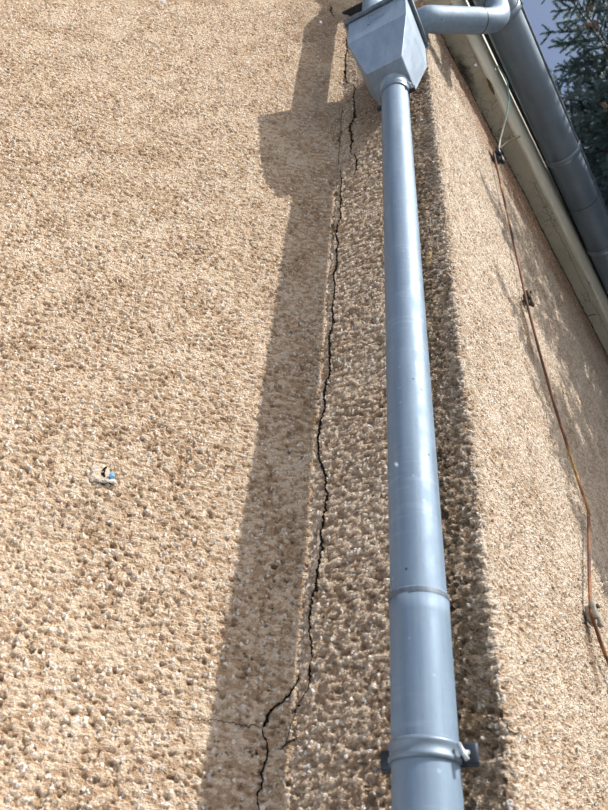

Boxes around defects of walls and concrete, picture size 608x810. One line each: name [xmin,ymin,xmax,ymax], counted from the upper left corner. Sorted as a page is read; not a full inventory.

crack [109,37,358,810]